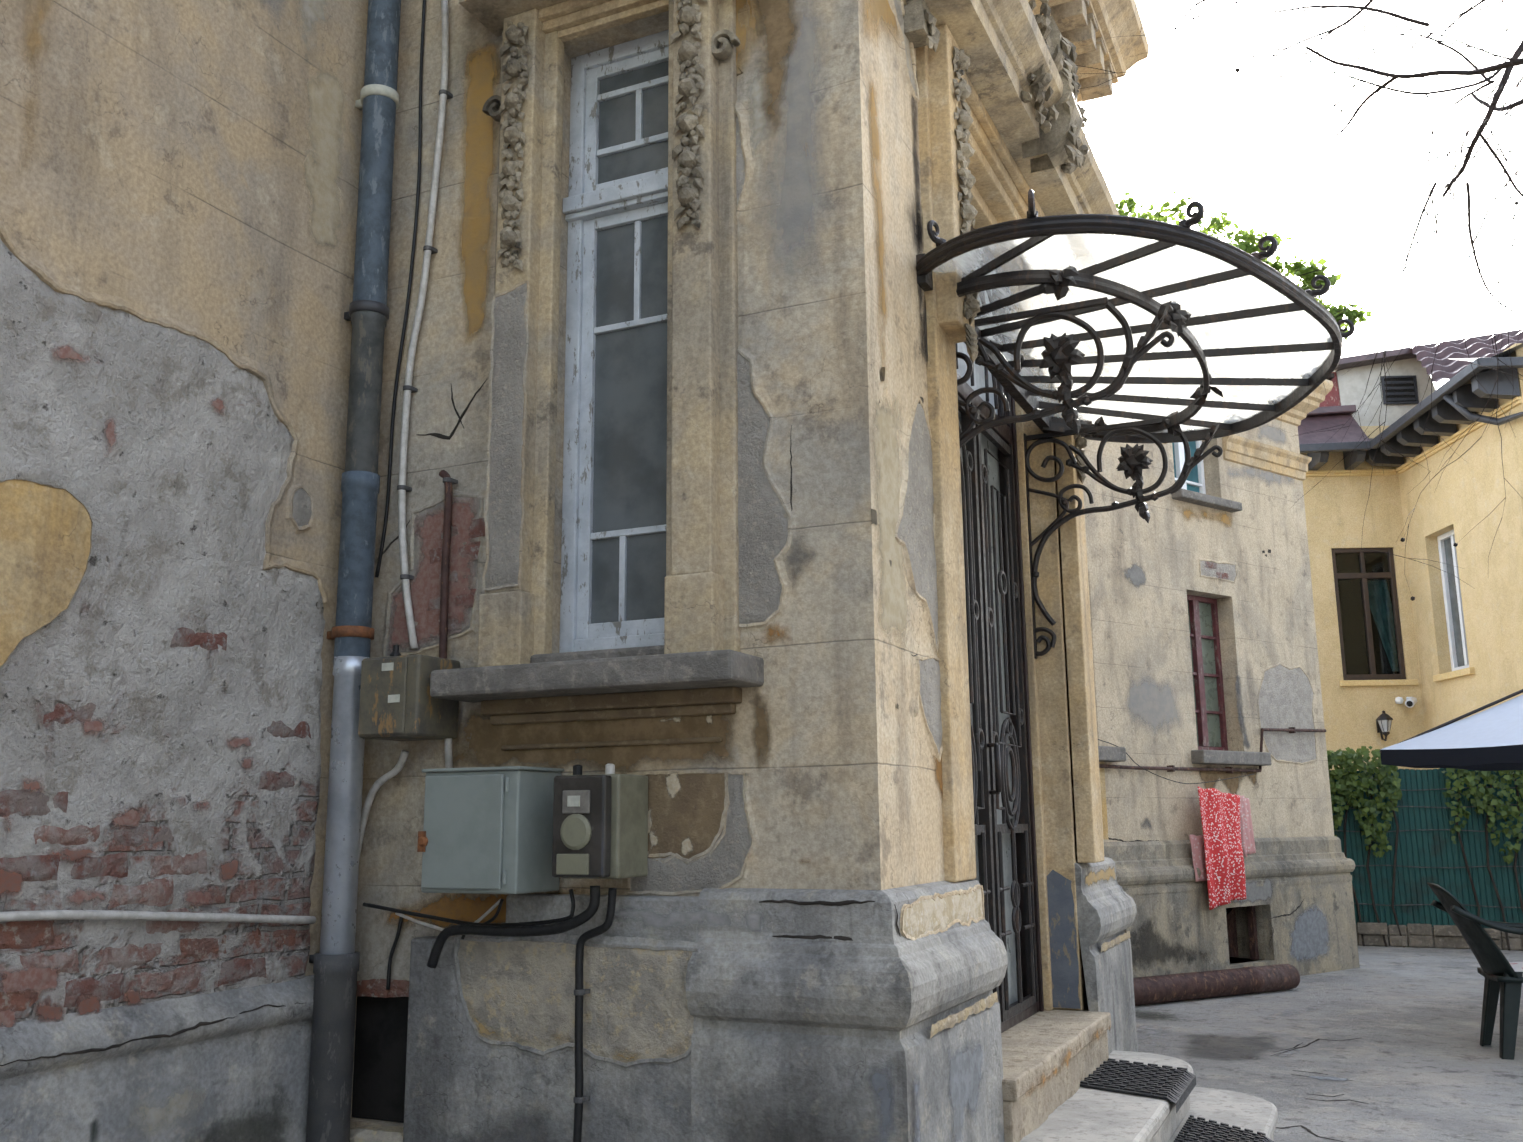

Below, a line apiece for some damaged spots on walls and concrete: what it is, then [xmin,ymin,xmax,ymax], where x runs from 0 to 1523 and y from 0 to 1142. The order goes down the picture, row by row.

crack [417,379,487,440]
spalling [737,346,797,633]
spalling [0,220,329,1027]
spalling [895,393,943,762]
spalling [1256,662,1317,766]
peeling [626,769,759,896]
crack [0,1003,304,1066]
peeling [451,933,704,1072]
crack [759,899,901,941]
peeling [1047,866,1116,1009]